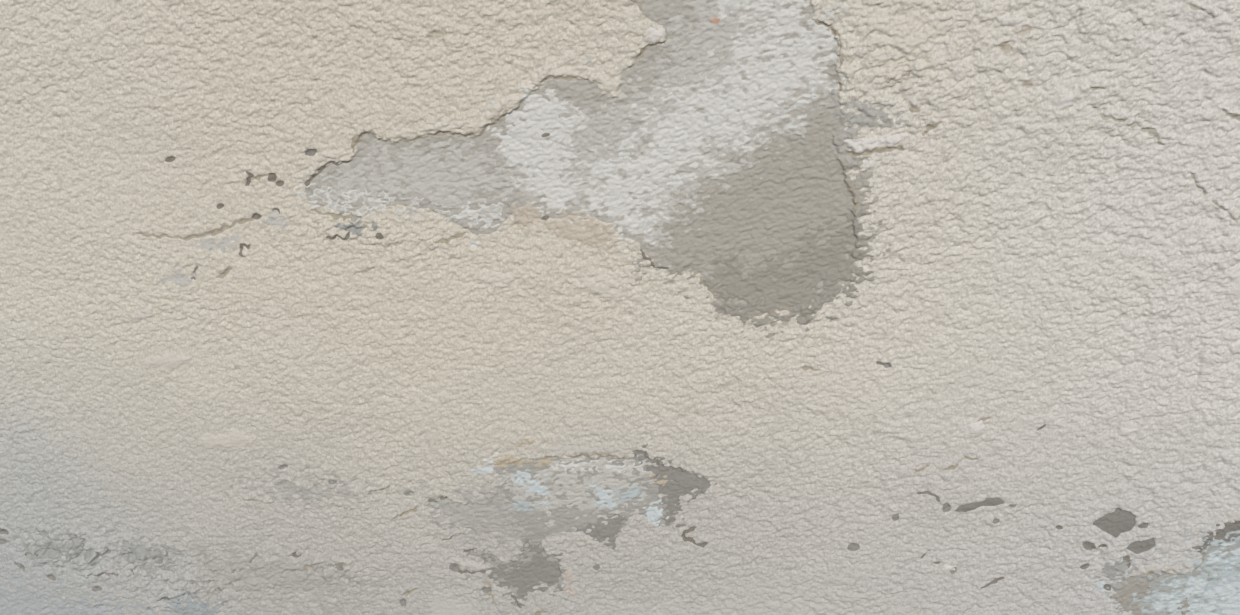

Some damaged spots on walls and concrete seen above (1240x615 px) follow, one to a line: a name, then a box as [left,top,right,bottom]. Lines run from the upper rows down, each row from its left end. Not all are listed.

spalling [252,0,912,339]
spalling [437,442,718,608]
spalling [1080,508,1240,615]